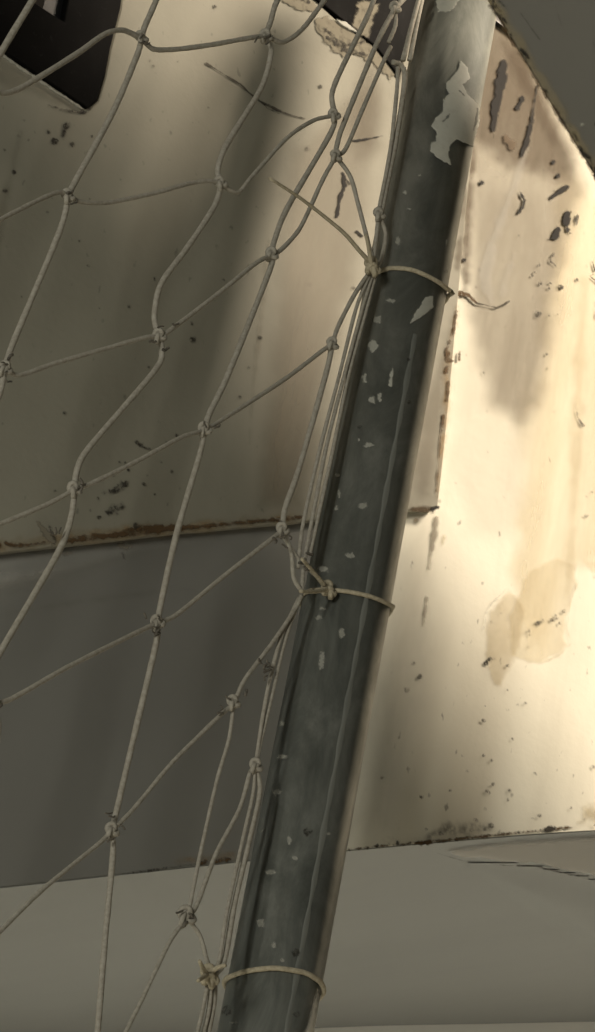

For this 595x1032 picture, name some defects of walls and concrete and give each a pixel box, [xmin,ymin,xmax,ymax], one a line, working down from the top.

crack [206,62,304,119]
damp [480,0,561,170]
damp [464,157,475,256]
crack [458,291,510,309]
corrosion [67,515,302,544]